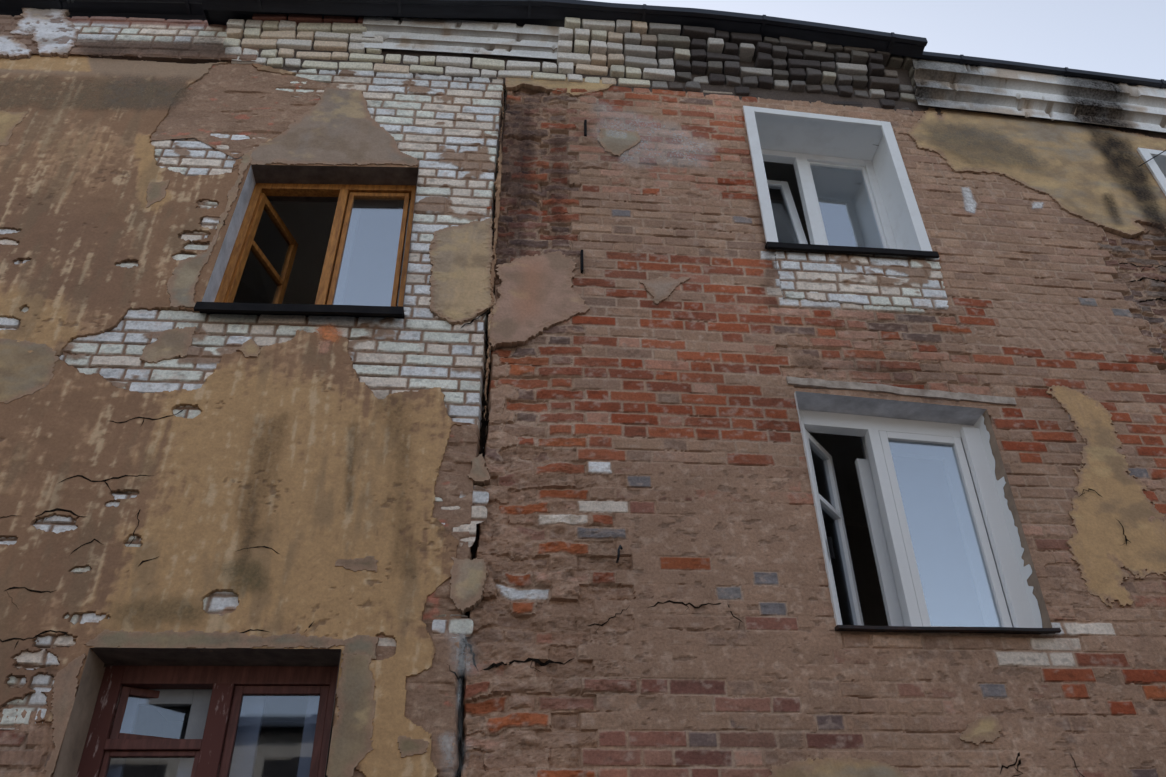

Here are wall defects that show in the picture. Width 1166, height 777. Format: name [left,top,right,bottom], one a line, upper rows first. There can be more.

peeling [0,8,80,60]
crack [492,89,506,246]
peeling [907,107,1166,239]
water stain [1067,76,1166,230]
spalling [59,69,614,560]
crack [461,309,490,458]
crack [0,475,159,565]
crack [471,524,479,560]
peeling [1037,380,1166,609]
spalling [0,613,109,777]
spalling [405,578,473,777]
crack [447,612,574,777]